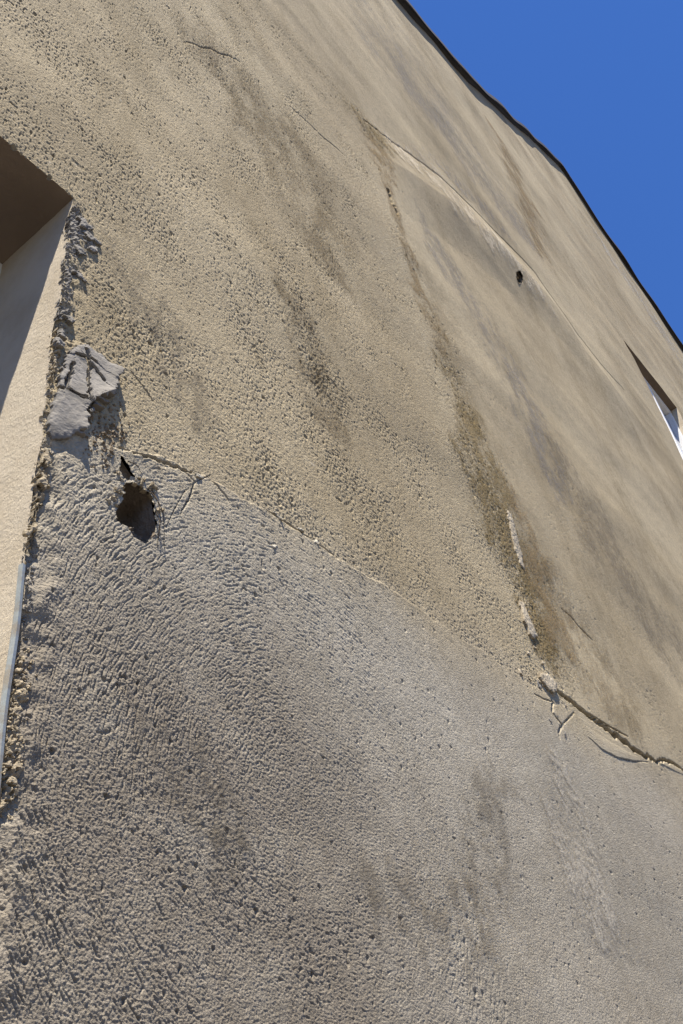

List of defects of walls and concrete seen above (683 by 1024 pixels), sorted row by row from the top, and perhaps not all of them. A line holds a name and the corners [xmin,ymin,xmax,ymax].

water stain [352,106,544,298]
spalling [0,205,130,821]
spalling [116,482,156,544]
crack [167,468,211,524]
crack [271,511,319,549]